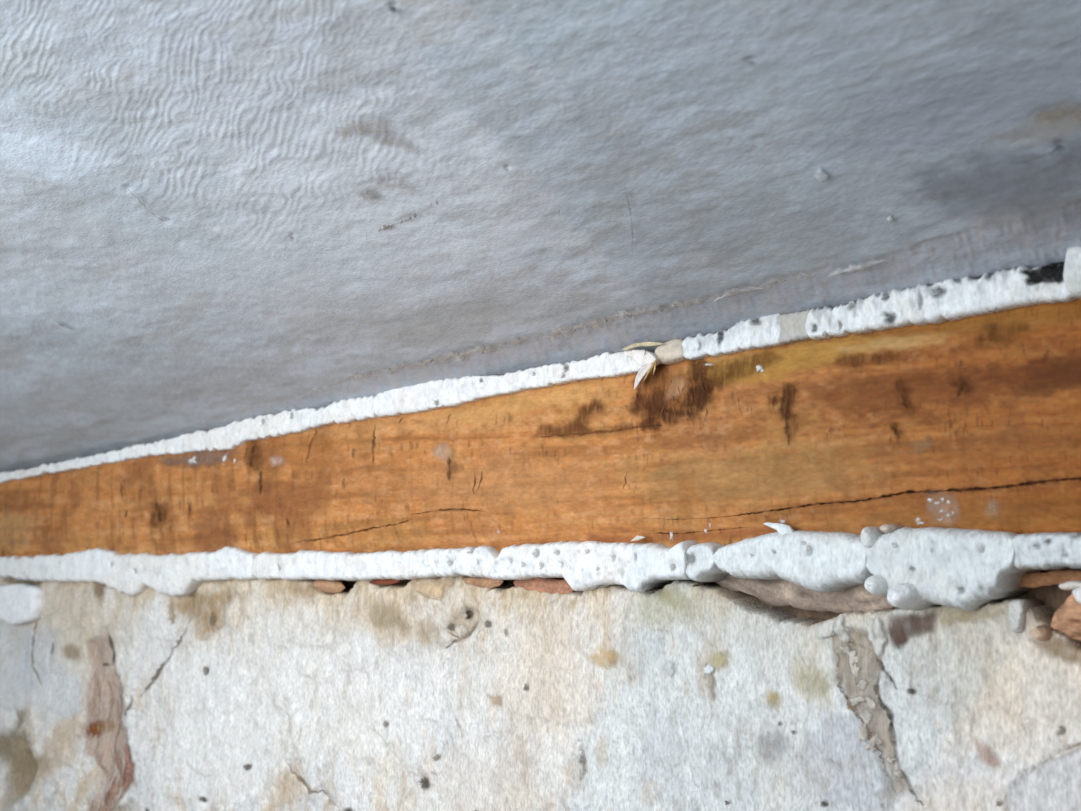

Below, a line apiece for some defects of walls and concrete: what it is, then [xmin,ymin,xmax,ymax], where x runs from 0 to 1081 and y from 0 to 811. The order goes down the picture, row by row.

flaking render [82,633,134,811]
crack [124,622,189,717]
flaking render [838,628,903,791]